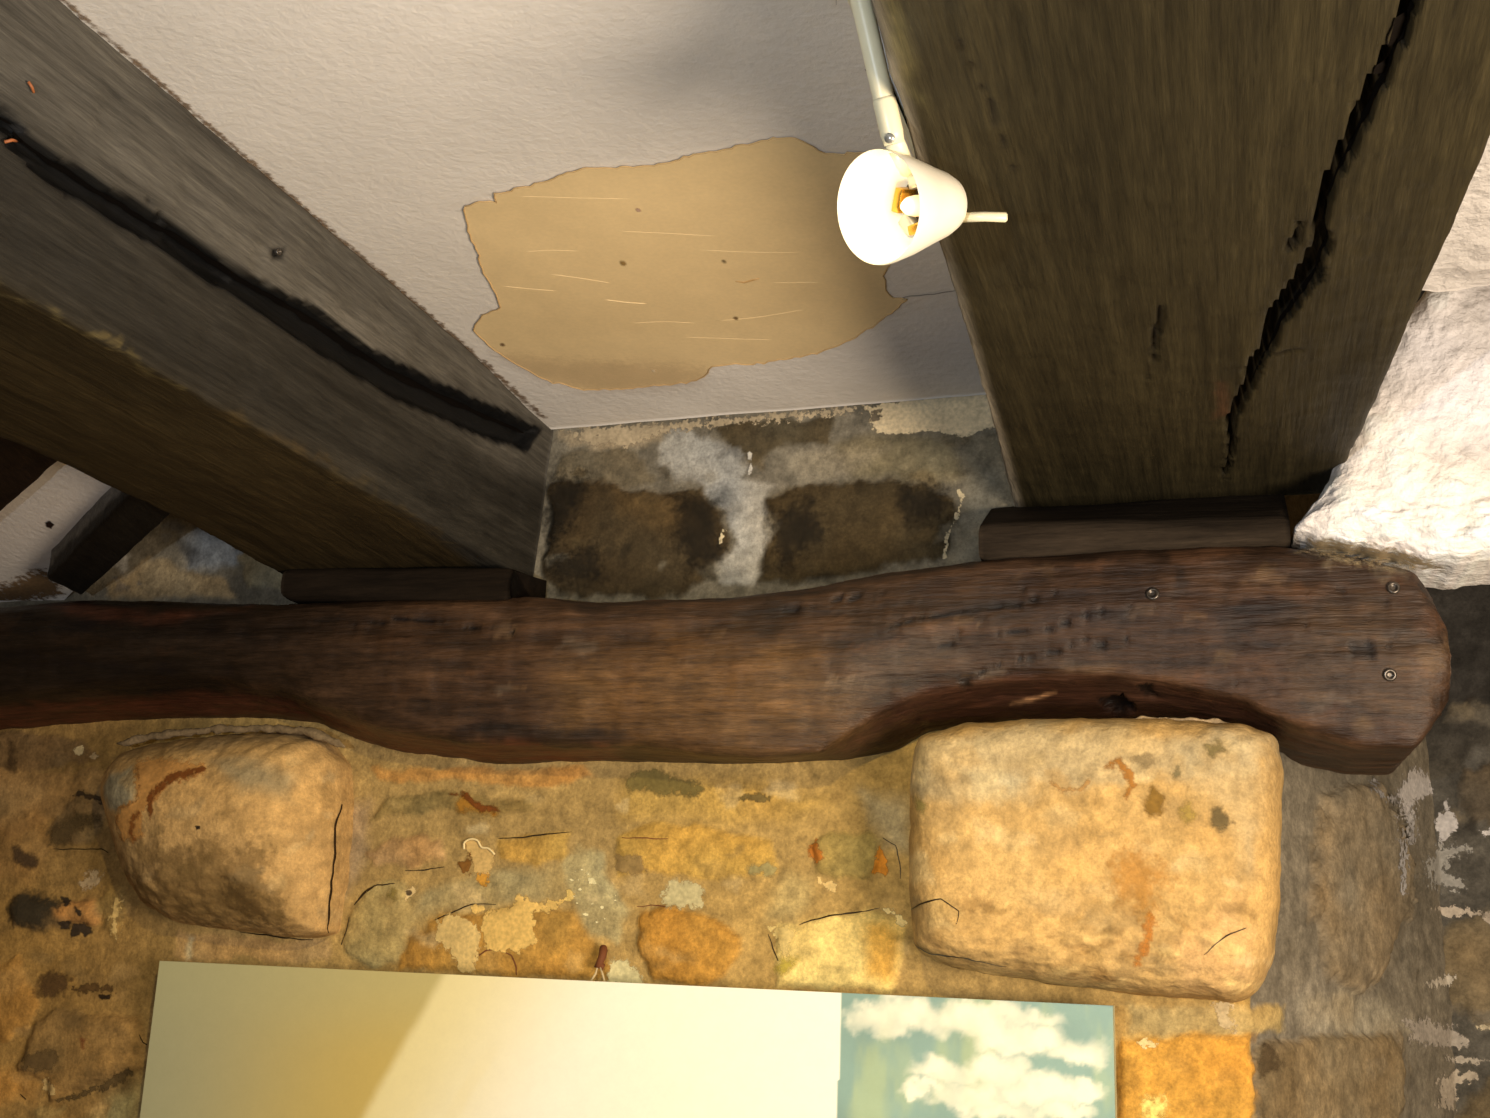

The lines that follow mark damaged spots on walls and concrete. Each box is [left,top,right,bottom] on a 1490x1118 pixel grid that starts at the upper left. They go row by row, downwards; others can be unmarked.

peeling [463,137,908,391]
damp [560,404,865,451]
damp [942,489,965,559]
rust [115,757,206,843]